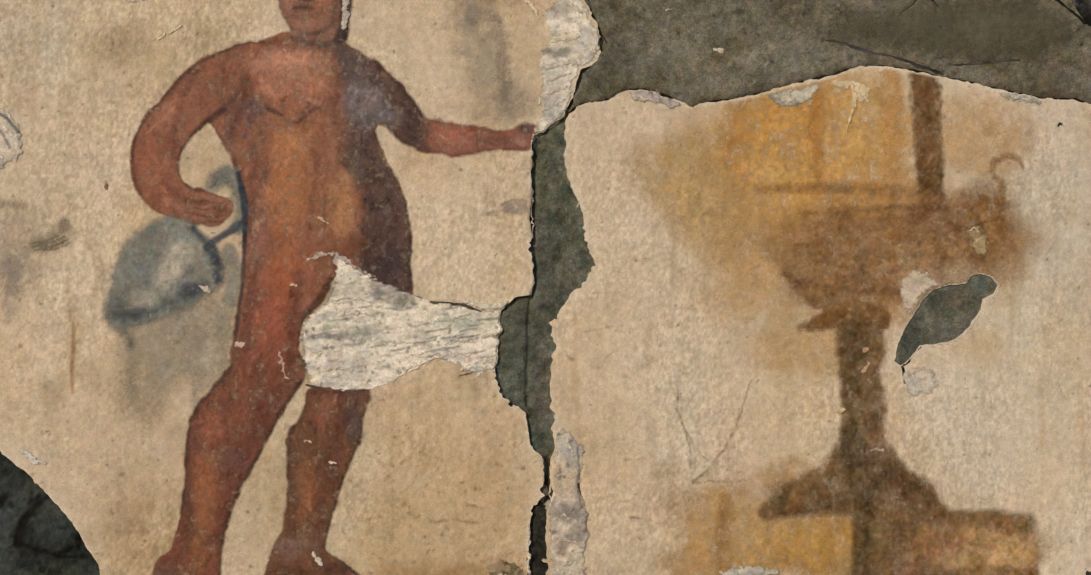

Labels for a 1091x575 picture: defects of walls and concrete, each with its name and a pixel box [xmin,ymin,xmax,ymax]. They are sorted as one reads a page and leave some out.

crack [824,39,1021,74]
peeling [630,89,680,108]
peeling [1001,93,1041,105]
peeling [0,108,23,169]
peeling [969,226,988,255]
flaking render [300,0,600,575]
flaking render [895,270,1002,396]